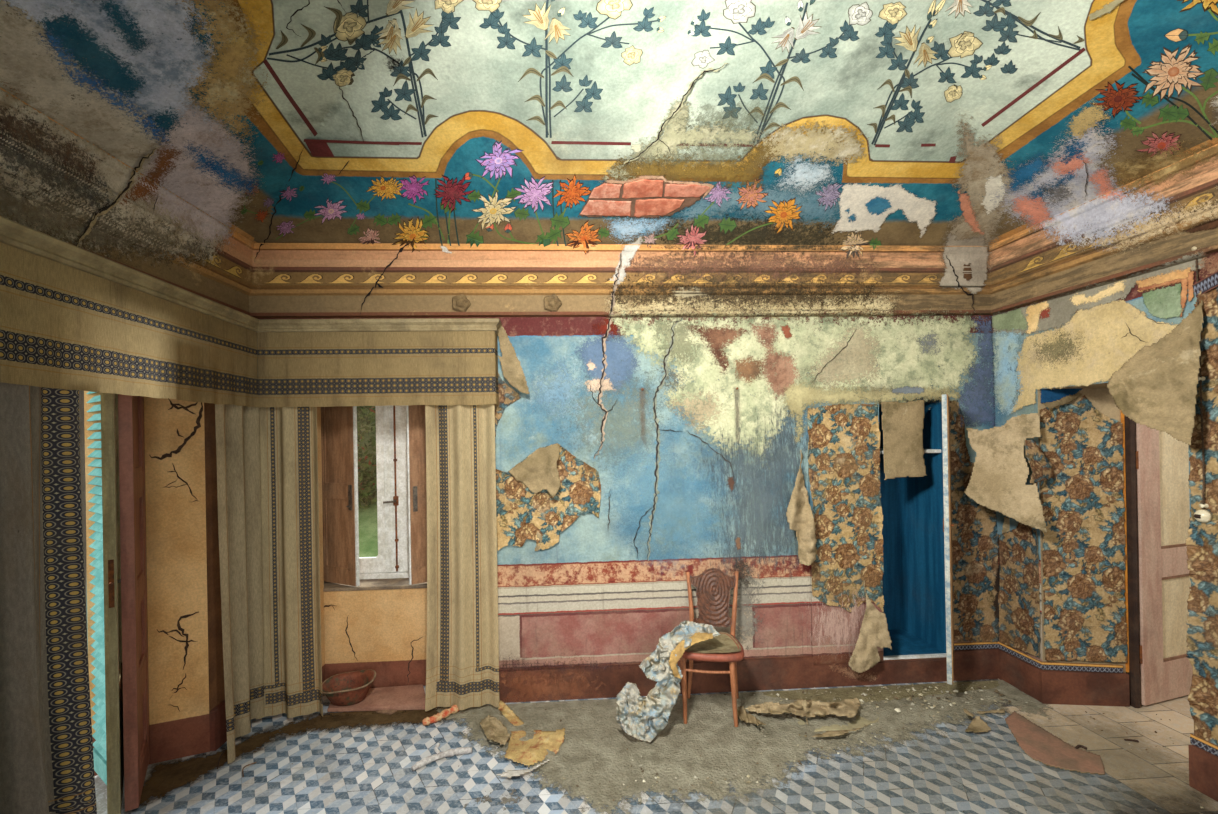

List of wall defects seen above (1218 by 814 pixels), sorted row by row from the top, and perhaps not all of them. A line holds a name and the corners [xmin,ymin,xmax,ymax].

crack [76,148,158,247]
peeling [0,0,281,273]
crack [360,237,415,314]
crack [589,253,622,459]
crack [608,318,734,561]
crack [620,63,728,166]
water stain [563,149,905,647]
peeling [578,95,1218,468]
water stain [794,588,878,659]